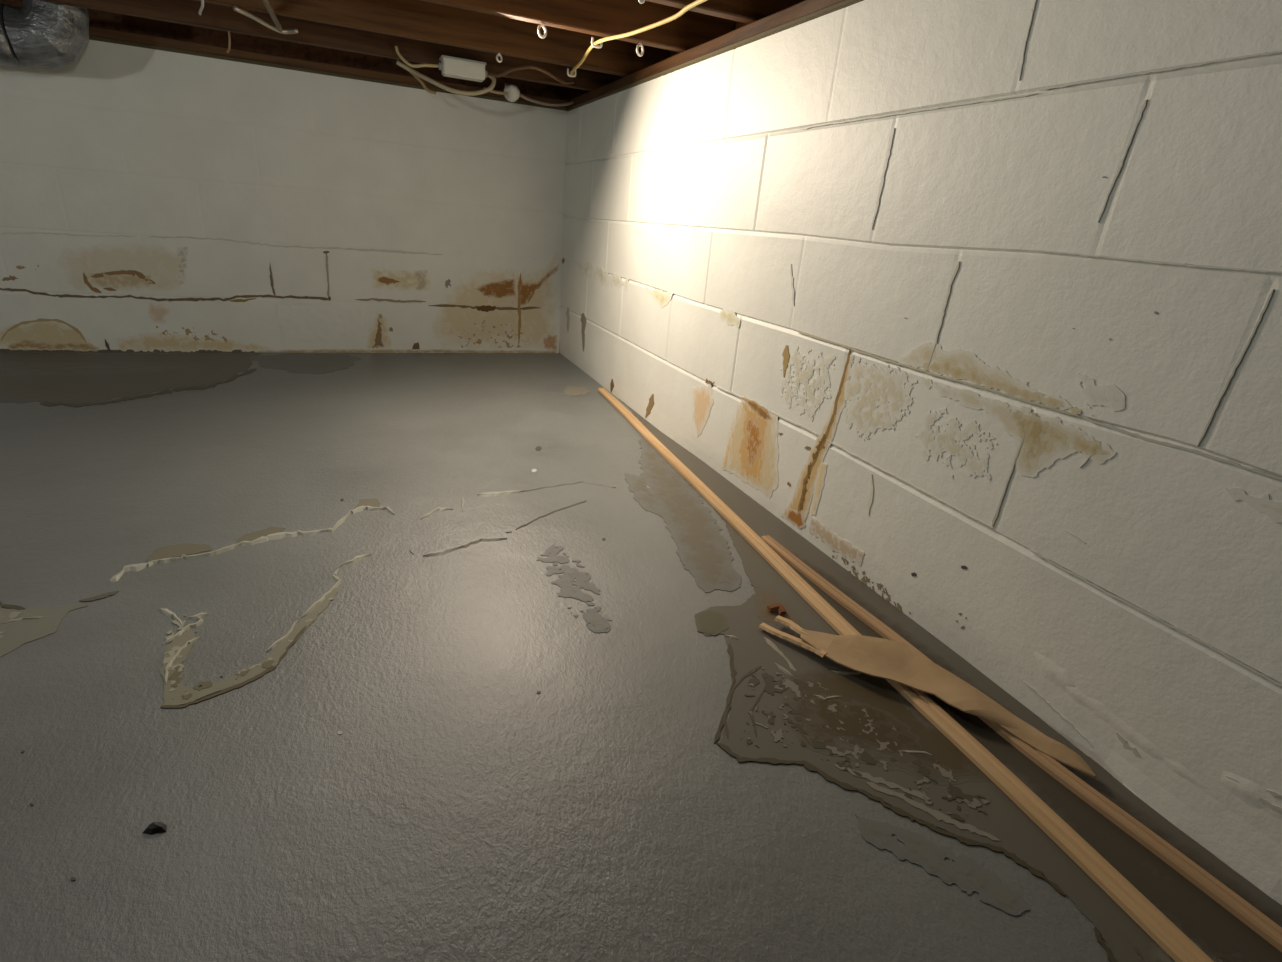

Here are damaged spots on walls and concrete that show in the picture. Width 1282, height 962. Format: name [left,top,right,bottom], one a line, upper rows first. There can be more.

crack [800,0,1282,230]
crack [0,232,540,310]
damp [0,242,556,407]
rust [371,252,565,351]
rust [723,349,854,529]
damp [780,342,1126,480]
crack [716,250,1282,528]
peeling [0,602,88,657]
peeling [159,553,372,709]
damp [619,399,1282,962]